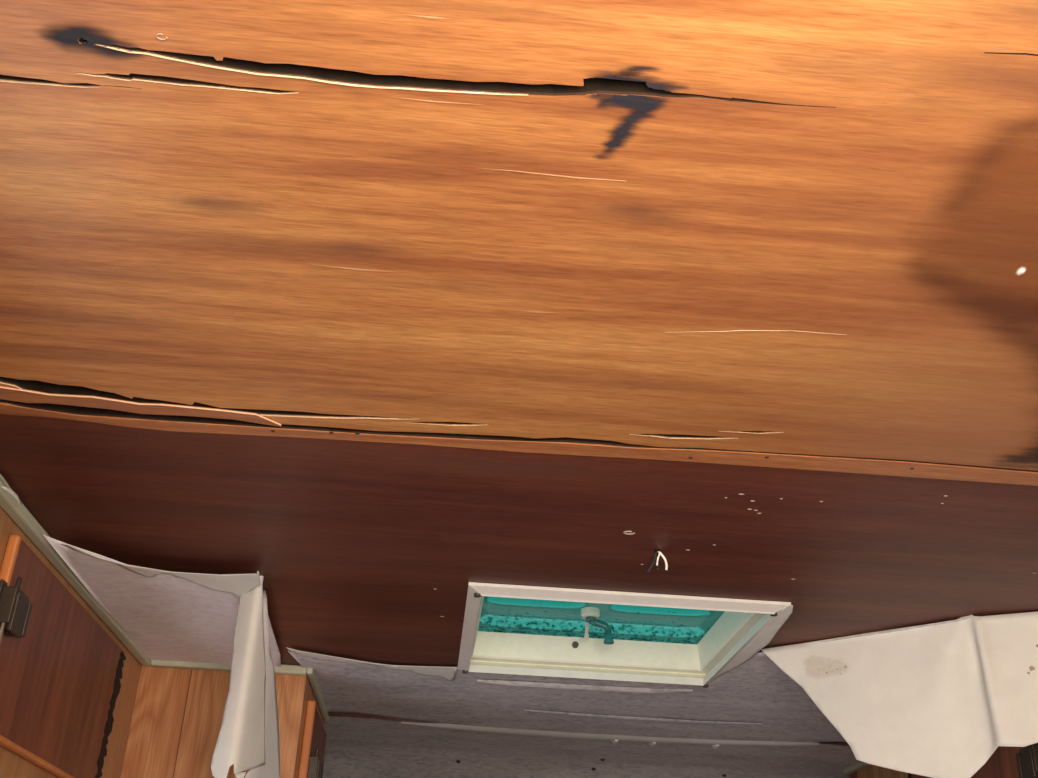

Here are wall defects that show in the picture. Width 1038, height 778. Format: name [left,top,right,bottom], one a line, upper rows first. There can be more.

water stain [45,26,139,56]
crack [0,44,836,108]
water stain [592,67,682,158]
crack [675,328,846,336]
crack [0,377,1038,472]
water stain [1007,448,1038,463]